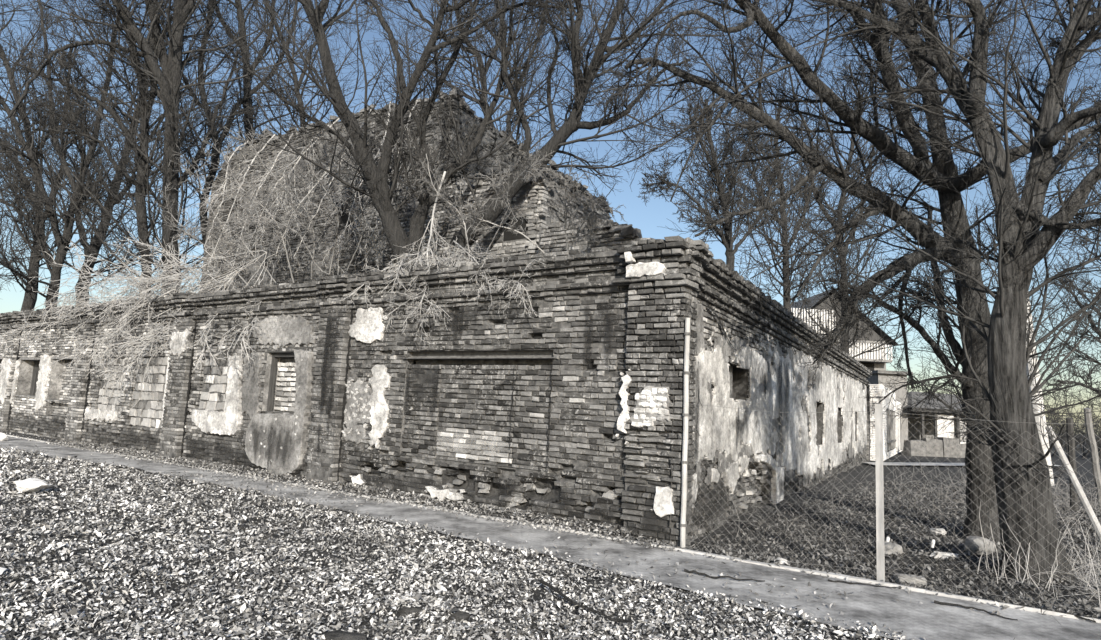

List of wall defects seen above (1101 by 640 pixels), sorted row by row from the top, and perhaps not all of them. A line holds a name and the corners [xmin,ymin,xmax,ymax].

peeling [240,312,319,420]
spalling [339,365,392,450]
peeling [626,388,671,427]
peeling [692,302,867,509]
peeling [425,466,490,504]
spalling [509,483,548,507]
spalling [575,490,618,512]